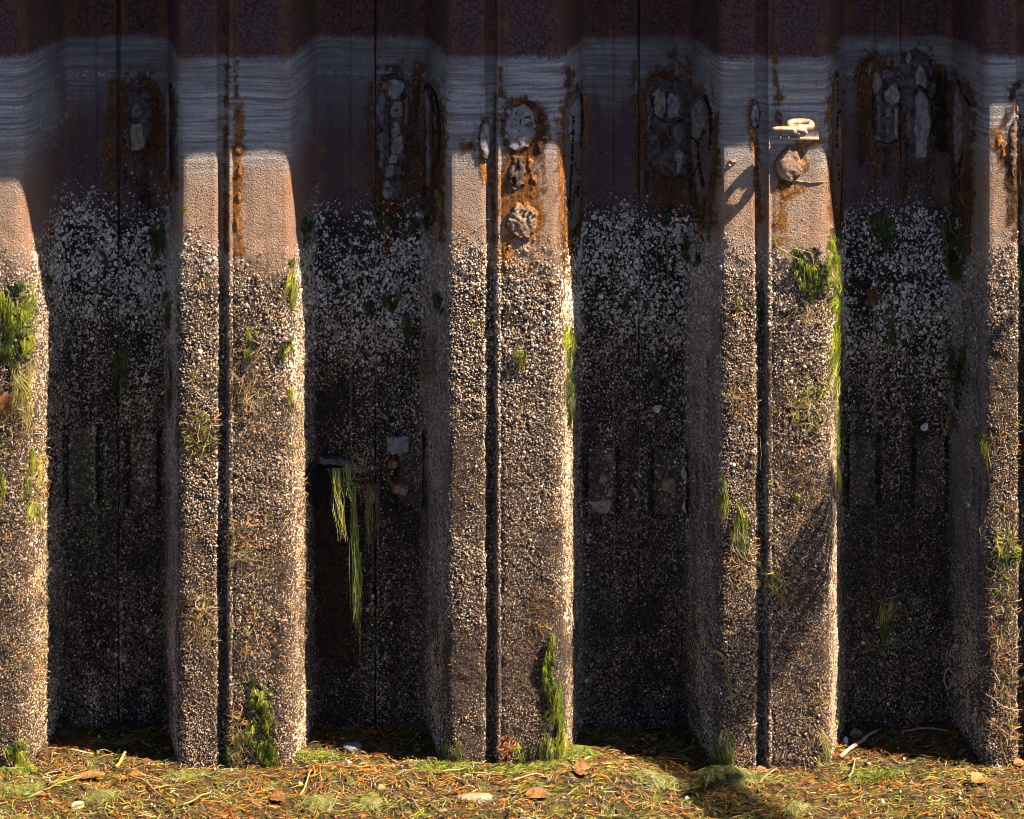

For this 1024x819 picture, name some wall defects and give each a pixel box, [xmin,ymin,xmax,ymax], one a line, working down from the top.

rust [222,61,247,257]
spalling [370,58,449,258]
spalling [824,40,977,259]
rust [984,81,1021,191]